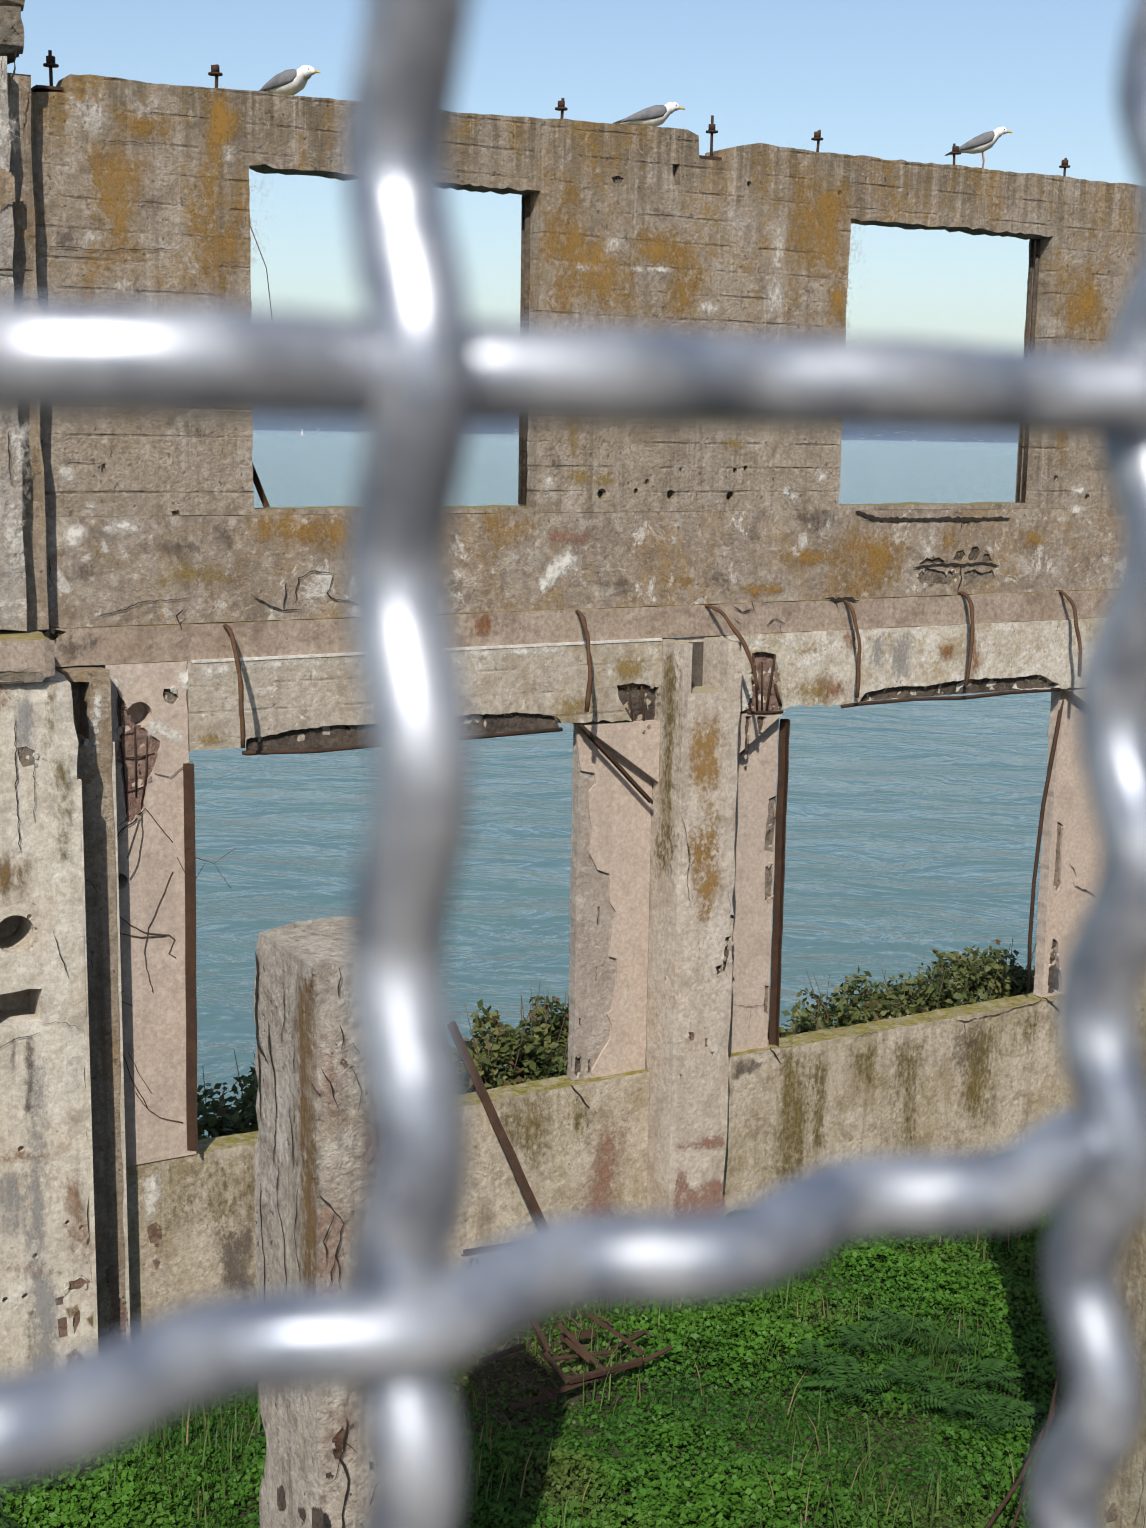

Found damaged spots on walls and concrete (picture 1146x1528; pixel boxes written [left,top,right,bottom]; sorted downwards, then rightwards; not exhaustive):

spalling [916,547,993,589]
spalling [617,682,661,734]
corrosion [819,681,843,698]
spalling [841,675,1061,708]
spalling [242,724,370,756]
spalling [468,712,563,740]
crack [117,808,146,840]
leakage [813,1066,826,1146]
corrosion [679,1136,724,1149]
corrosion [673,1173,724,1213]
crack [302,1418,357,1528]